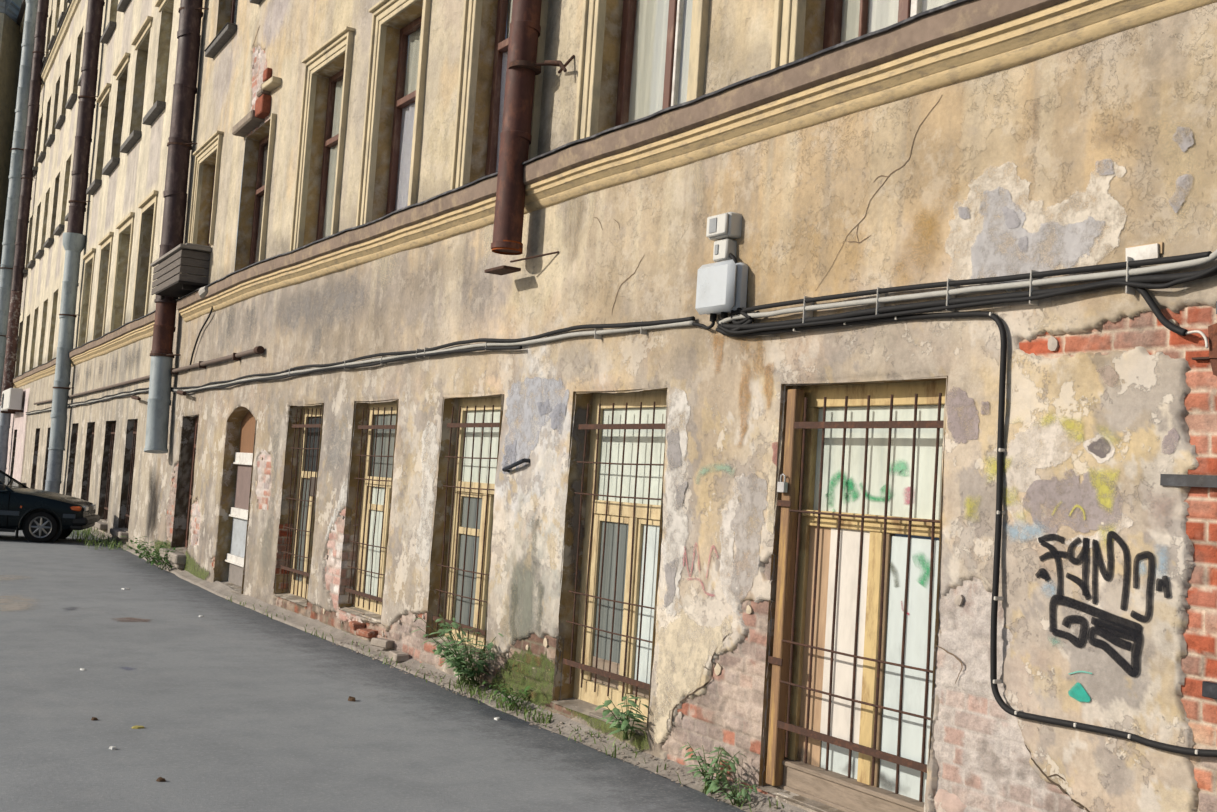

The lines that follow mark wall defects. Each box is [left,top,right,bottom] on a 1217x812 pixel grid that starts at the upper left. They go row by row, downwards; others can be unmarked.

corrosion [492,240,523,255]
crack [815,95,942,291]
peeling [945,159,1127,293]
flaking render [256,449,272,510]
flaking render [273,479,446,668]
crack [671,633,729,729]
flaking render [654,389,782,798]
peeling [946,388,989,444]
flaking render [933,577,1086,812]
flaking render [1003,305,1217,812]